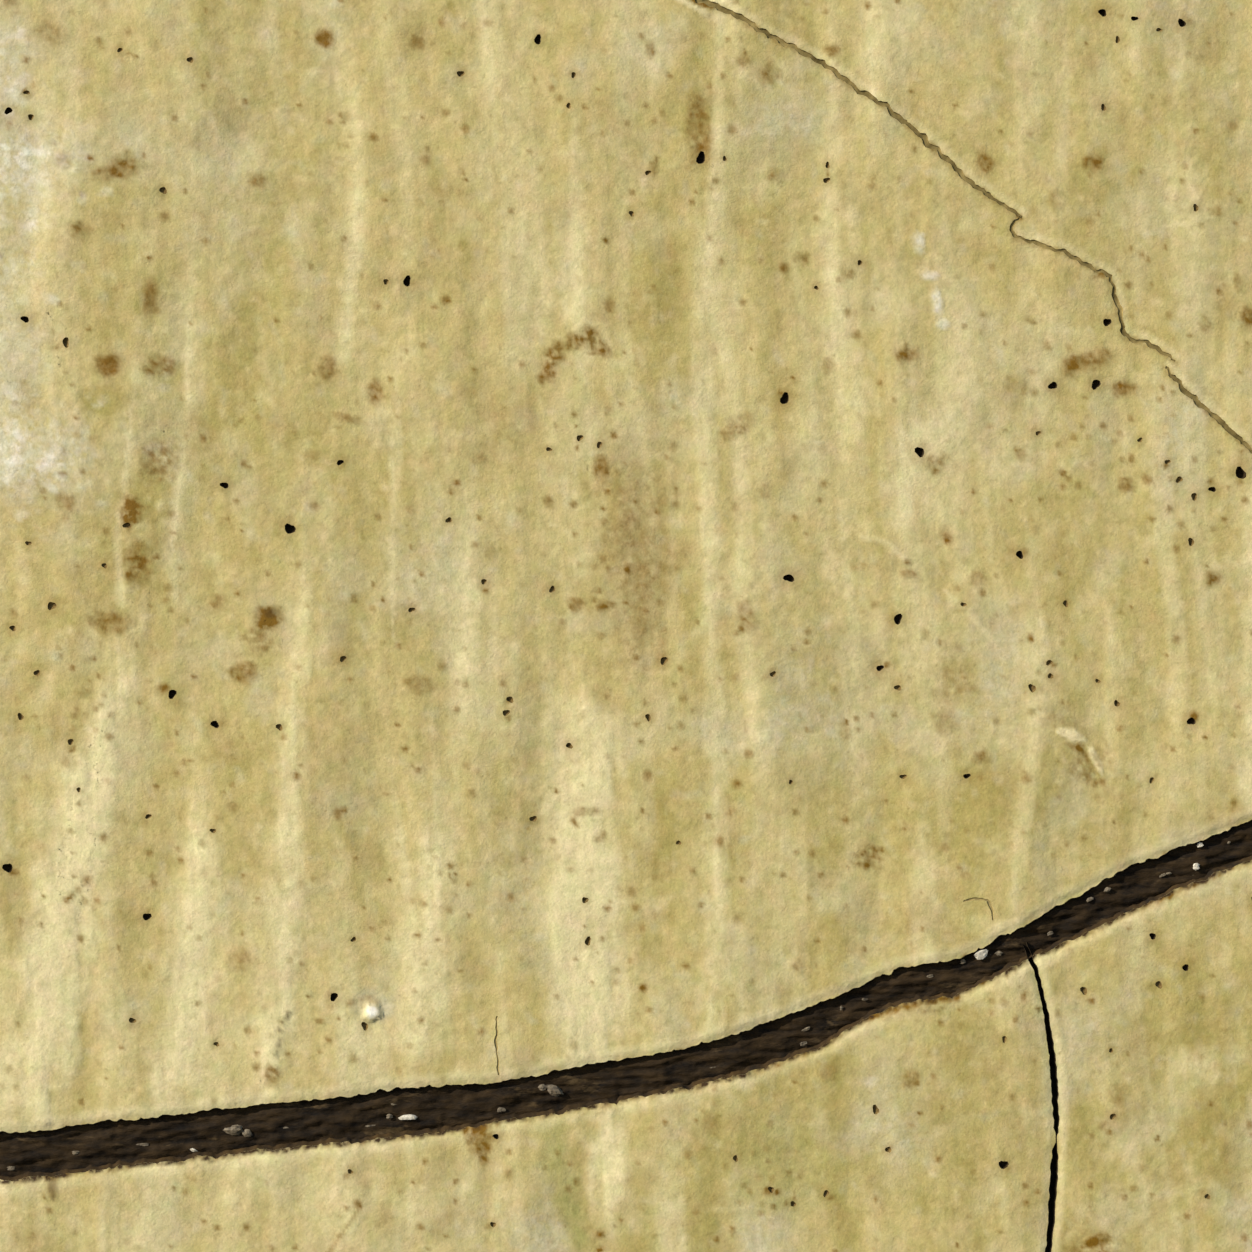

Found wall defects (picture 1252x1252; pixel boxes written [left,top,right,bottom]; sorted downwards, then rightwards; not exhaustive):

crack [695,0,1252,454]
crack [0,820,1252,1252]